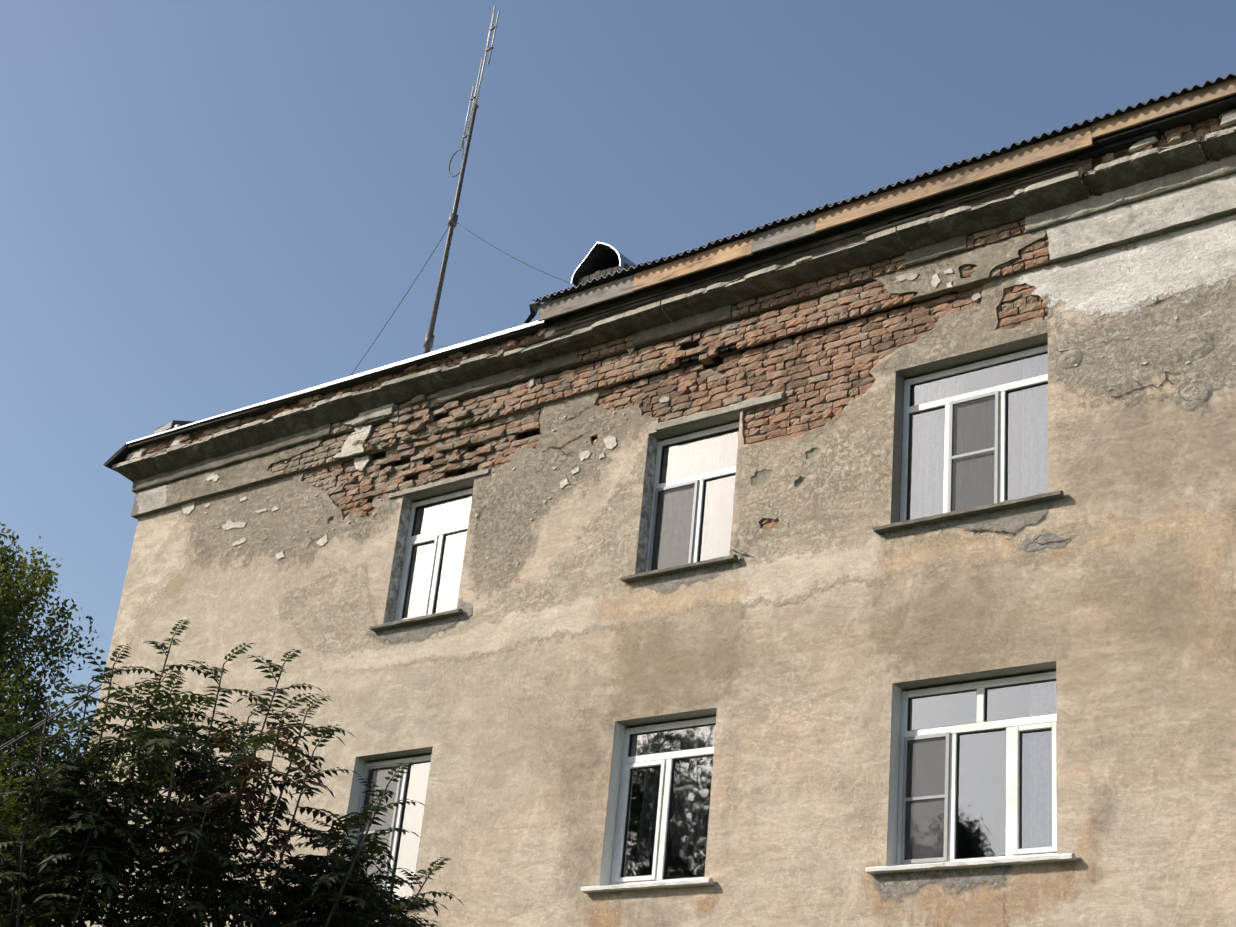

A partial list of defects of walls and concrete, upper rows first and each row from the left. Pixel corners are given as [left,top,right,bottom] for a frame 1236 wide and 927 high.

flaking render [103,173,1236,685]